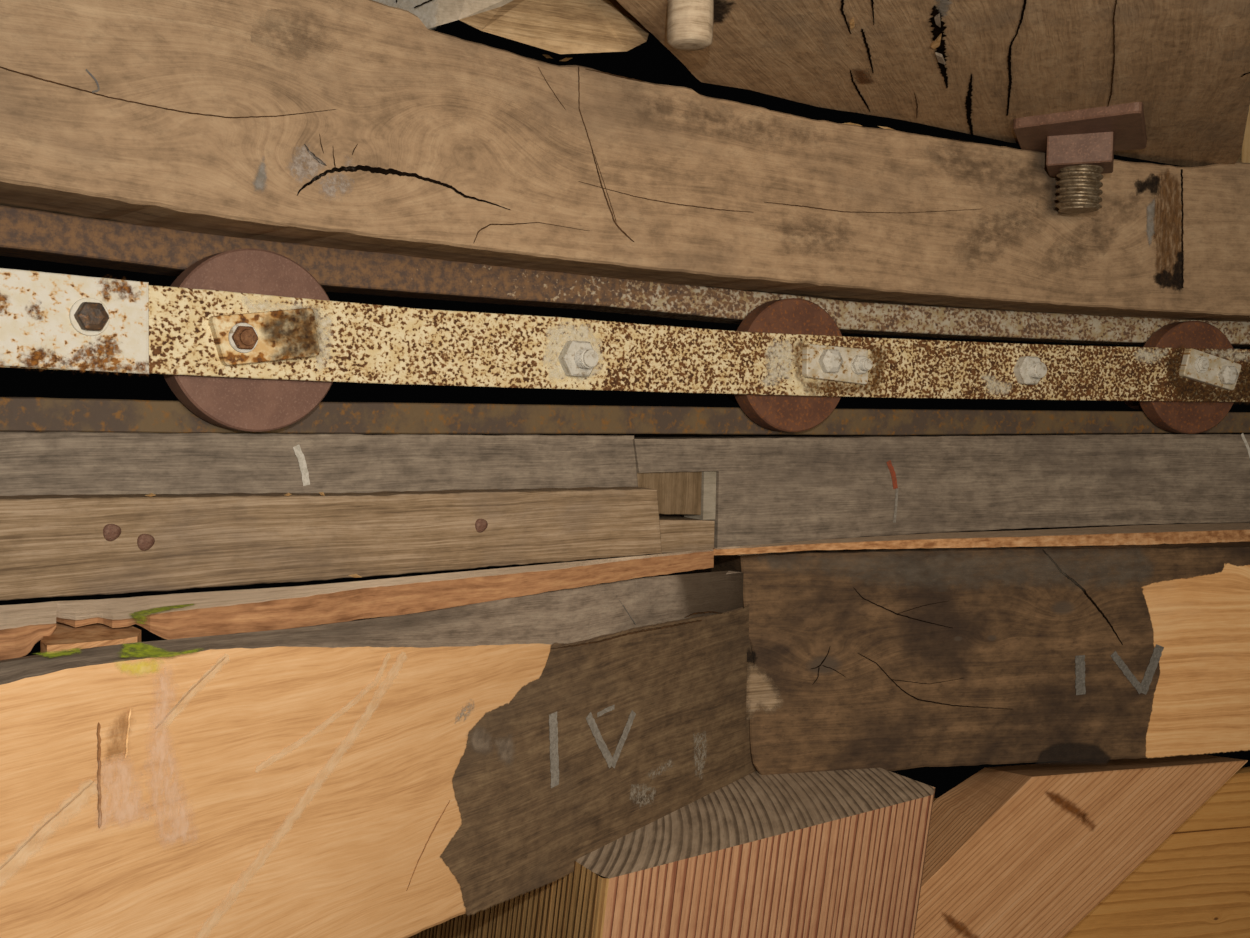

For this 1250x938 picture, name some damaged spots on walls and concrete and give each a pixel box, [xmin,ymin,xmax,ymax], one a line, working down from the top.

crack [840,0,874,112]
crack [929,5,973,137]
crack [1006,0,1027,116]
crack [1107,0,1117,107]
crack [0,66,976,242]
leakage [1135,171,1184,290]
corrosion [22,336,149,372]
corrosion [100,281,136,299]
corrosion [263,310,319,357]
corrosion [795,342,885,393]
corrosion [1167,347,1250,402]
crack [811,648,1006,709]